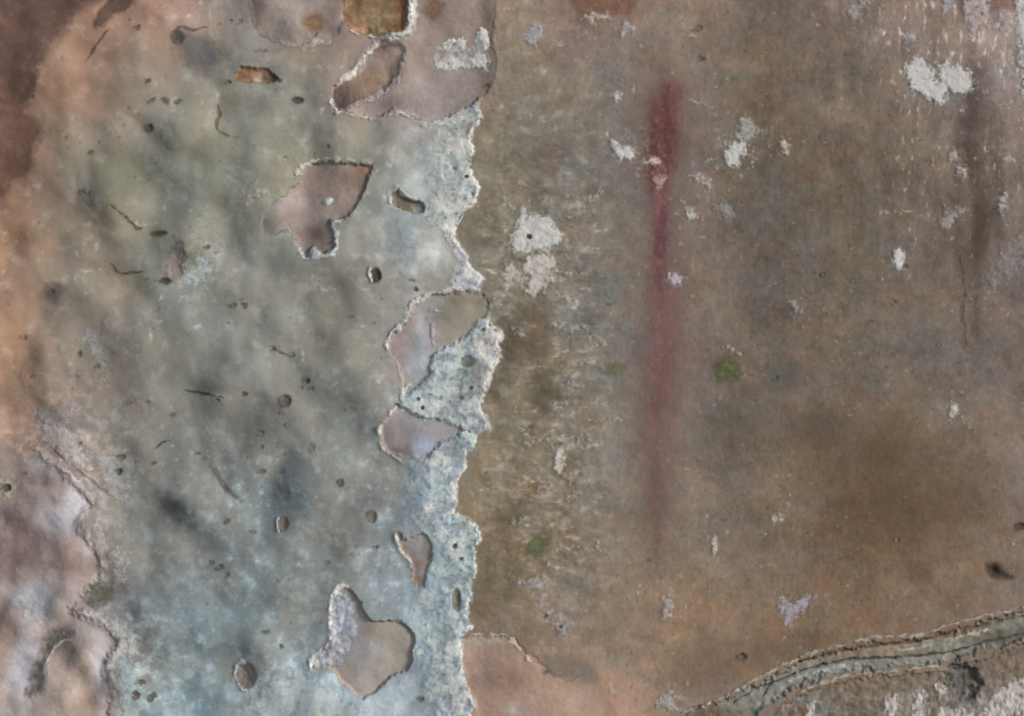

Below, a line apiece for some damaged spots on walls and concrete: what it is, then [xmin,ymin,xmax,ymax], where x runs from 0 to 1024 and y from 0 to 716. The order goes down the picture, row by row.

peeling [904,58,973,106]
flaking render [226,0,610,716]
peeling [778,594,811,626]
flaking render [645,606,1024,716]